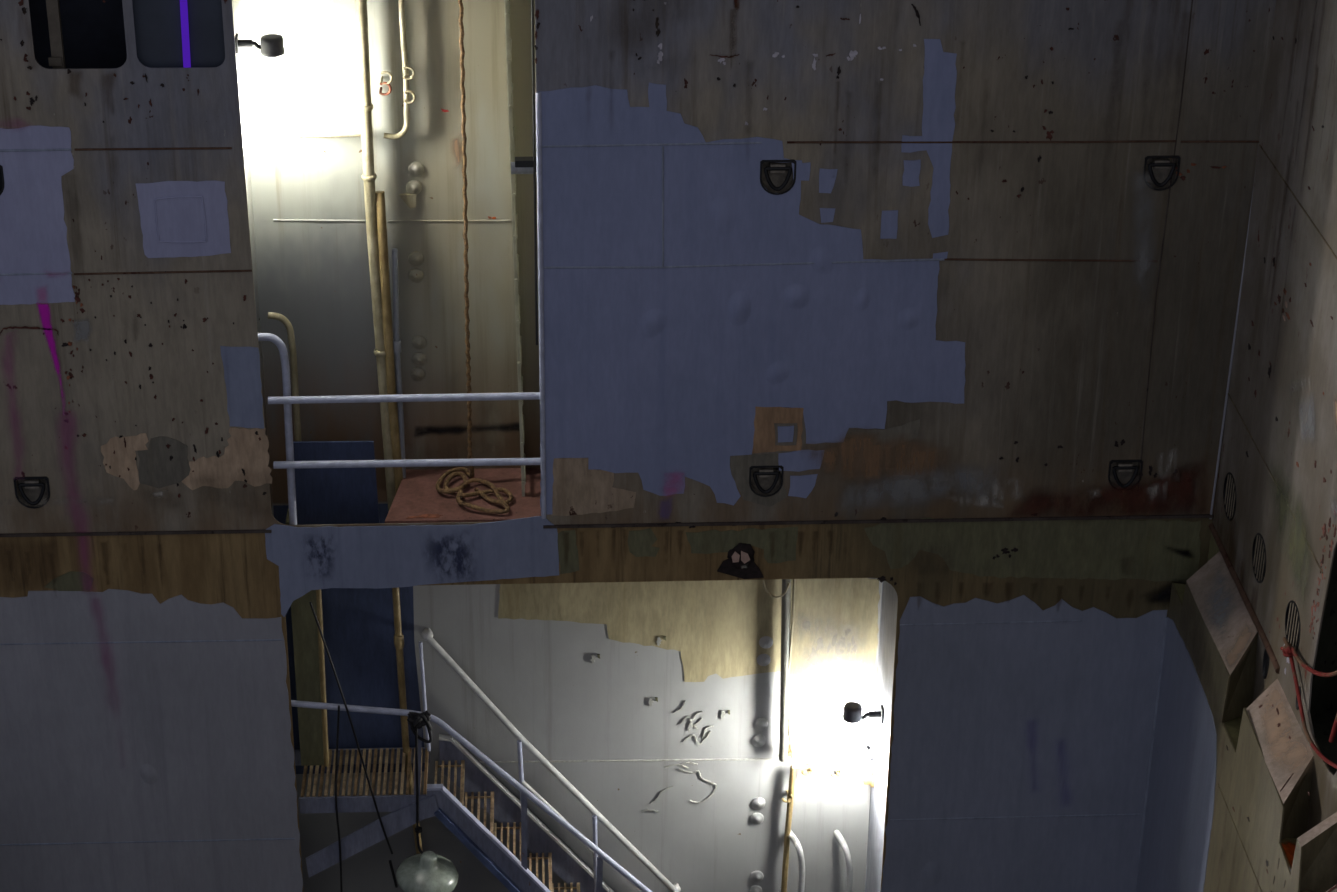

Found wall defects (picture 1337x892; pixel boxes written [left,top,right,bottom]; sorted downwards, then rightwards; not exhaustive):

peeling [101,433,149,490]
peeling [181,427,272,490]